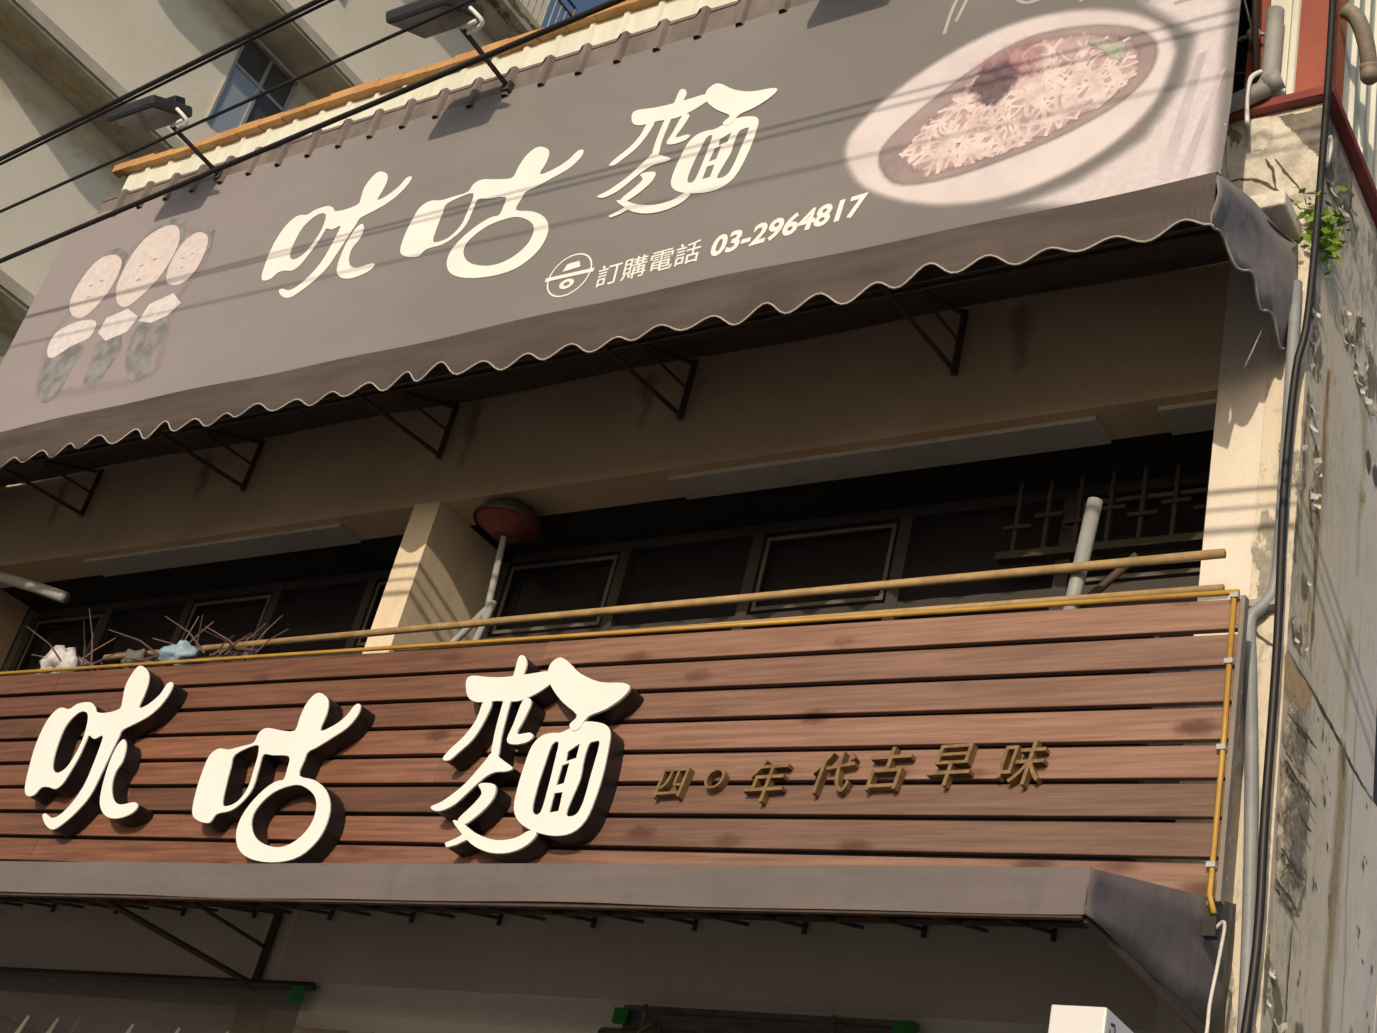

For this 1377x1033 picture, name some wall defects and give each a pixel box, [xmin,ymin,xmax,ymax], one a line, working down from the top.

damp [487,0,538,33]
peeling [1341,307,1367,394]
damp [1251,510,1275,599]
peeling [1288,283,1324,660]
damp [1291,416,1321,655]
flaking render [1275,700,1331,917]
crack [1256,602,1374,1033]